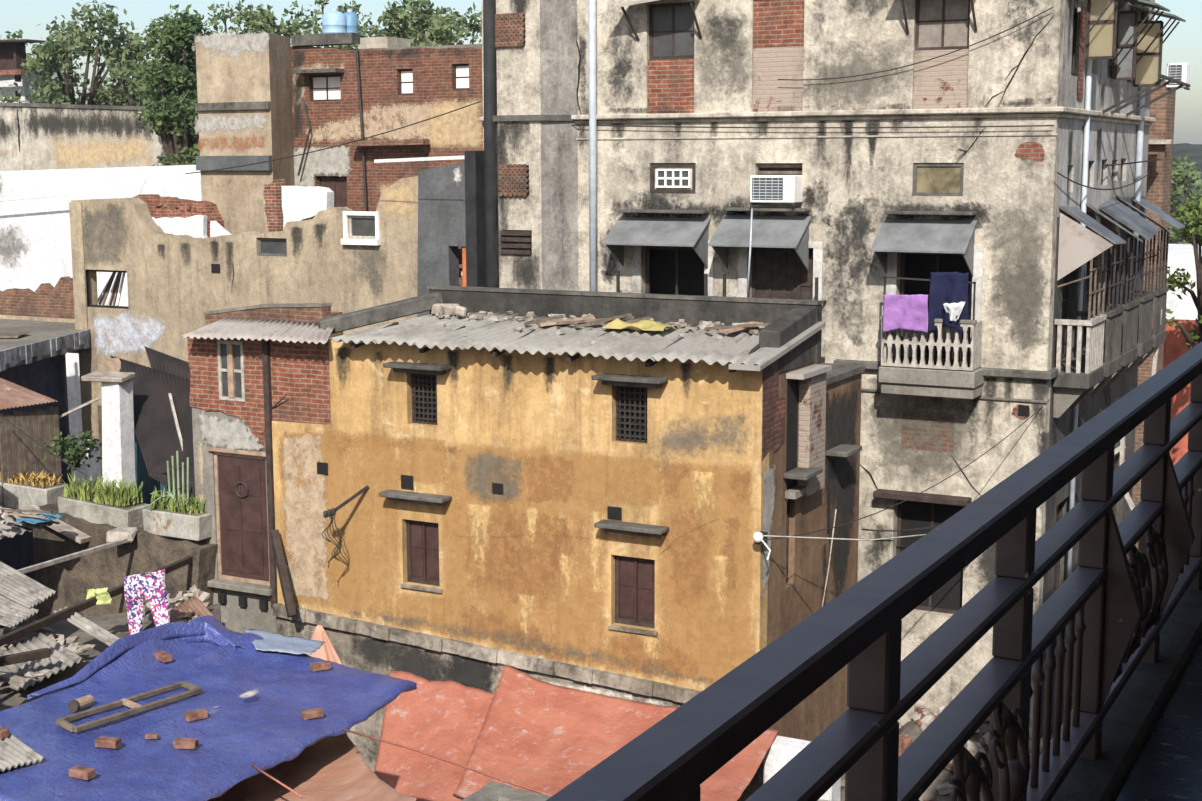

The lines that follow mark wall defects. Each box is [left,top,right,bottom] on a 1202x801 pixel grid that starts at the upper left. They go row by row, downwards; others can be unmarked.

water stain [0,106,151,138]
spalling [1015,141,1045,161]
water stain [600,230,616,283]
water stain [612,182,1042,348]
spalling [246,424,265,448]
peeling [280,359,786,683]